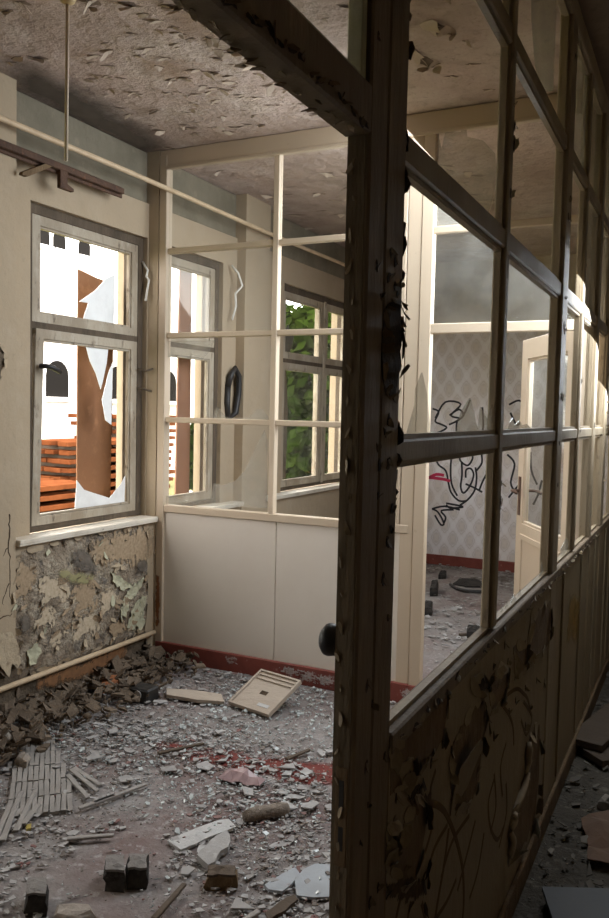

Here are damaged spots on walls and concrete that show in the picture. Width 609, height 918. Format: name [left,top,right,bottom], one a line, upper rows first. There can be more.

peeling [78,0,101,15]
peeling [5,55,48,66]
peeling [84,42,126,97]
peeling [117,0,369,136]
peeling [408,41,459,79]
peeling [376,413,404,514]
flaking render [0,523,155,705]
peeling [455,534,599,682]
peeling [279,666,341,693]
peeling [442,699,499,816]
peeling [508,722,545,867]
peeling [368,858,432,918]